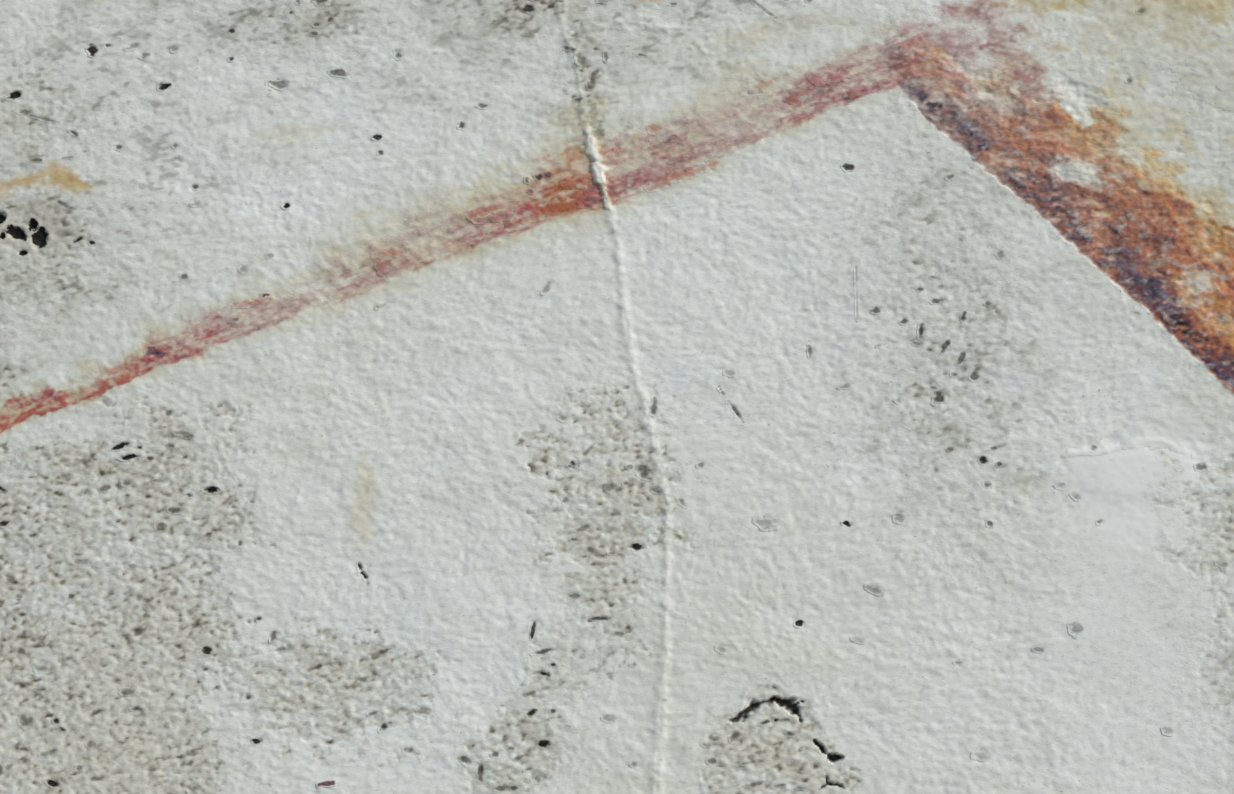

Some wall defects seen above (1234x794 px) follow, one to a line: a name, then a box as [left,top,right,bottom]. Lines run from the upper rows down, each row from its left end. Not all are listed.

water stain [463,0,768,112]
water stain [951,0,1234,139]
corrosion [0,0,1234,442]
water stain [0,355,718,794]
corrosion [339,392,384,591]
water stain [695,677,877,794]